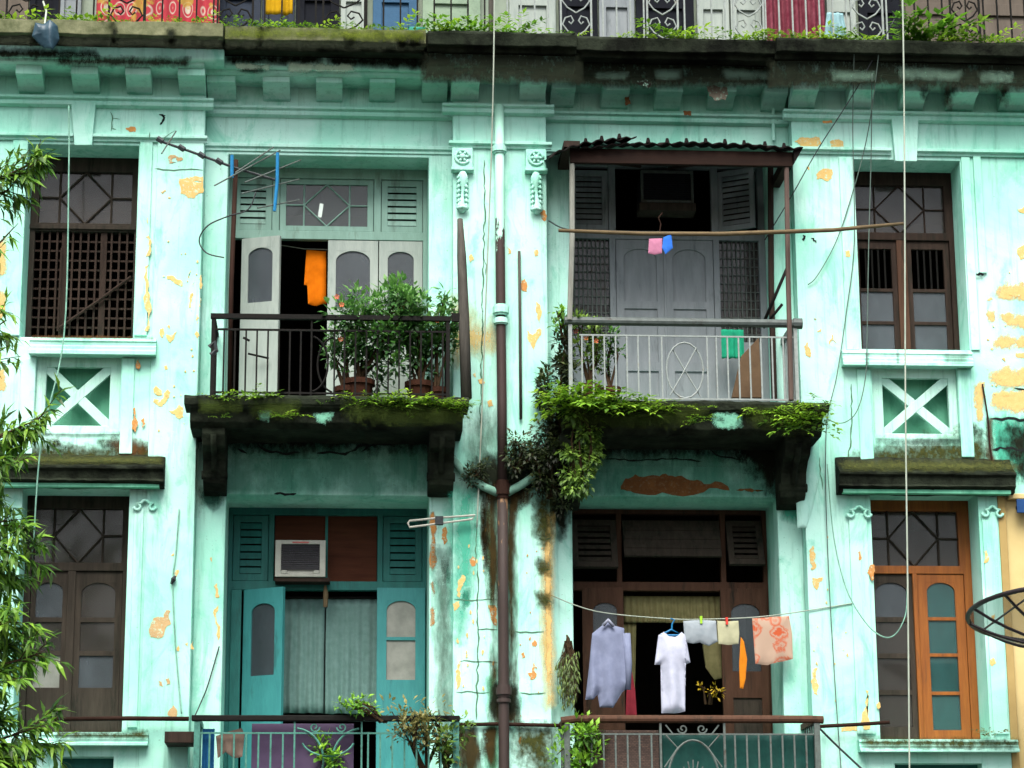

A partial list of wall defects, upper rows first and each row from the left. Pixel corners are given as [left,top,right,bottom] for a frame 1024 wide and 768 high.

damp [0,27,1024,109]
spalling [706,85,728,101]
peeling [795,137,844,147]
peeling [161,176,204,199]
peeling [806,166,833,181]
peeling [143,218,177,343]
peeling [974,272,1024,421]
peeling [621,474,764,496]
peeling [149,610,171,639]
damp [438,455,555,768]